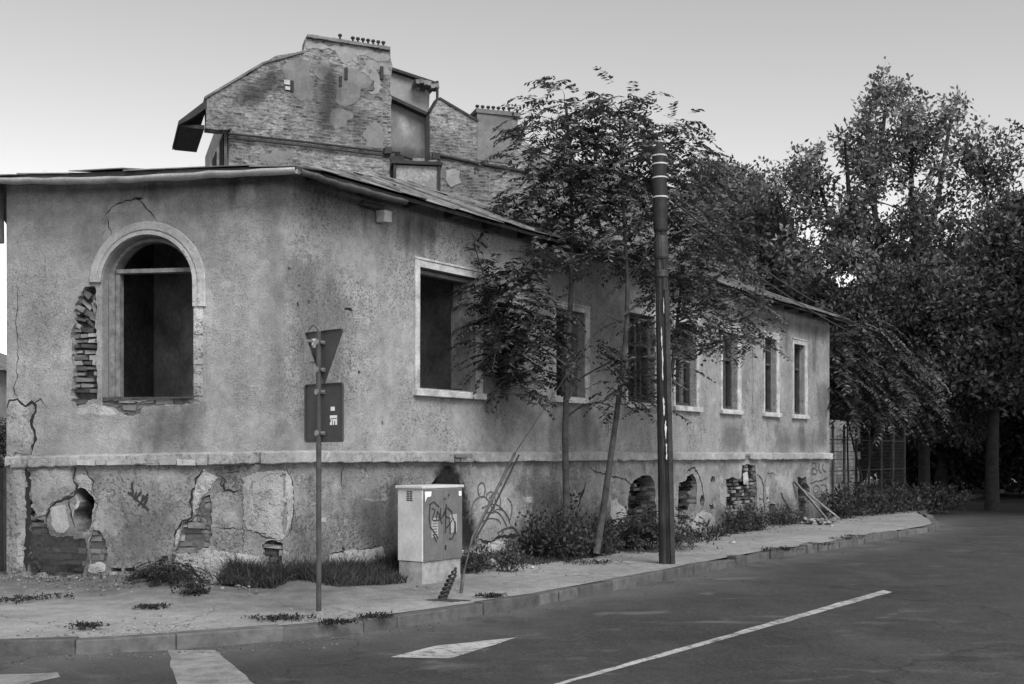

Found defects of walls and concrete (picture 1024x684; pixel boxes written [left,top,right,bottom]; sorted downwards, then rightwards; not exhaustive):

flaking render [281,40,389,129]
flaking render [363,120,386,149]
crack [102,186,156,235]
spalling [69,288,201,417]
crack [7,286,98,571]
spalling [7,401,109,577]
spalling [175,469,219,552]
flaking render [285,470,294,534]
spalling [610,474,657,531]
spalling [677,472,715,533]
spalling [726,463,758,525]